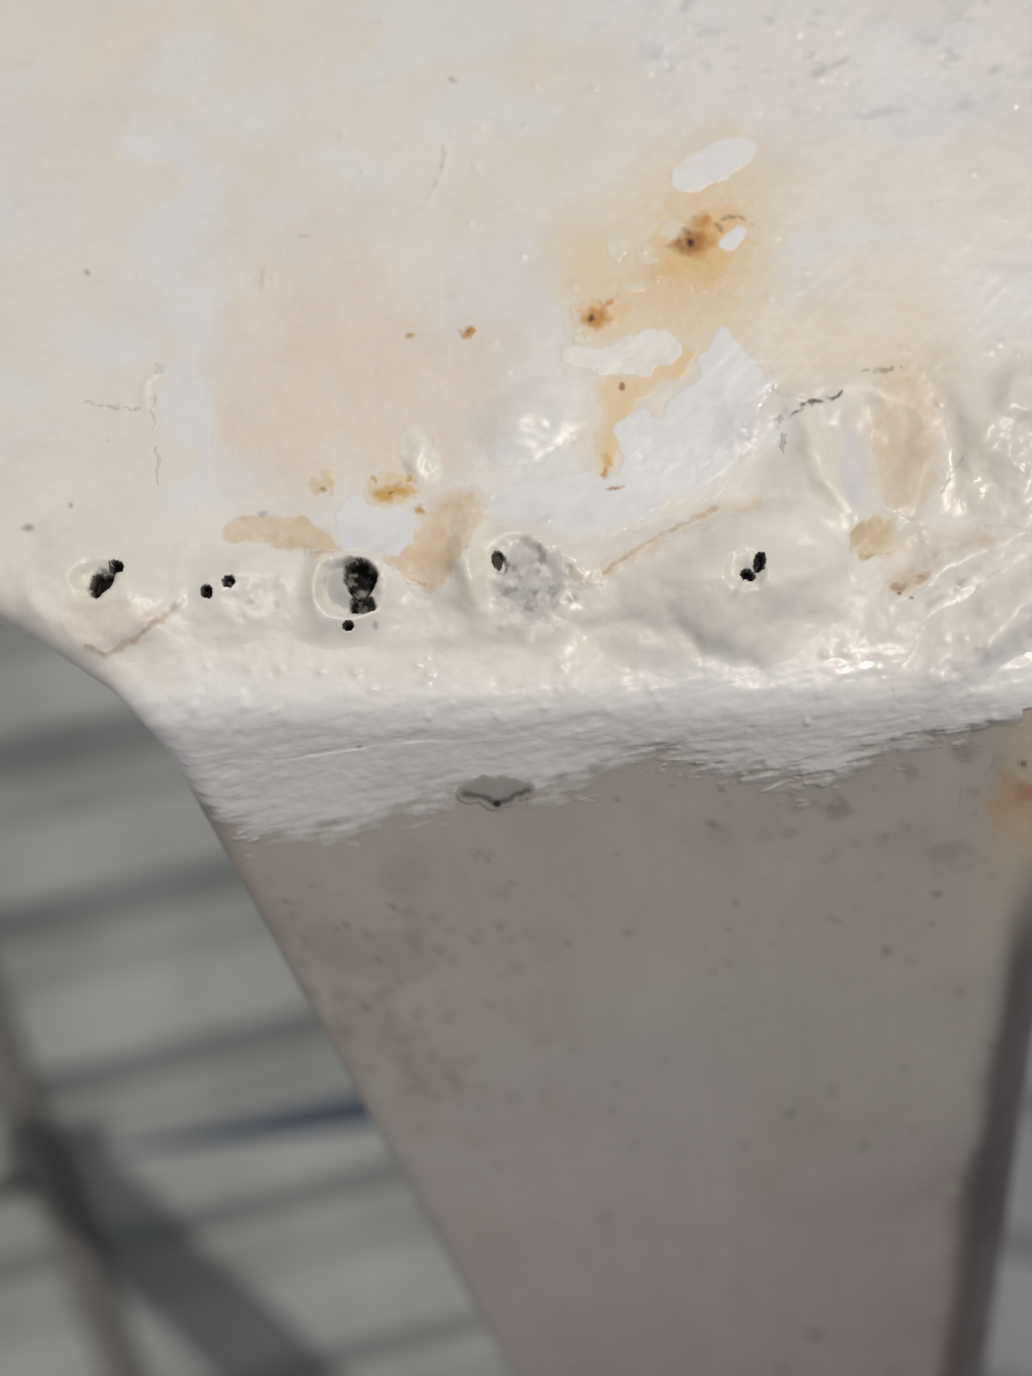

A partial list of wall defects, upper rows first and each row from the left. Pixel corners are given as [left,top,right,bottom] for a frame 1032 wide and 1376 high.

peeling [669,136,758,193]
rust [649,201,750,304]
rust [569,290,636,344]
peeling [221,325,778,627]
peeling [456,775,536,810]